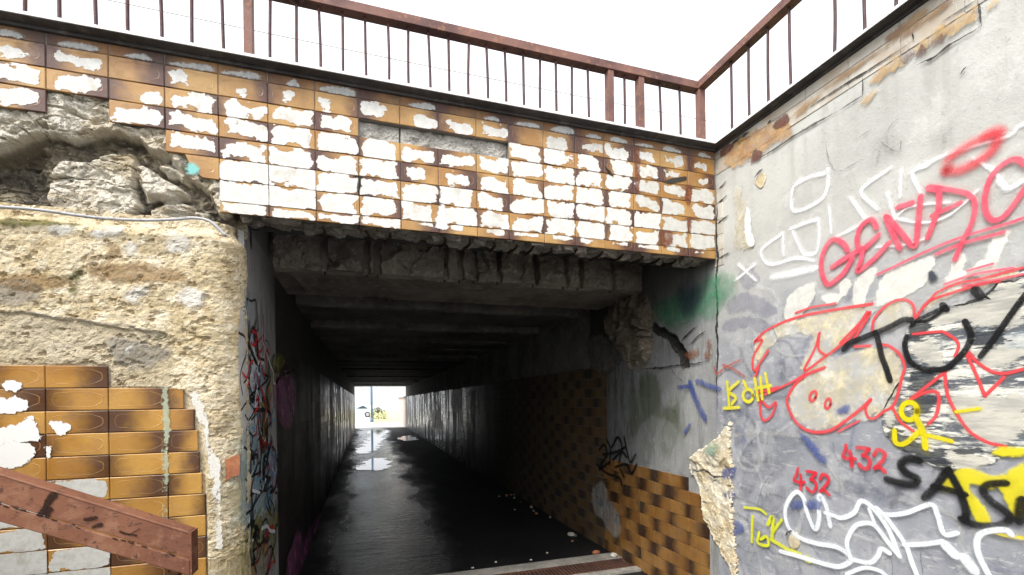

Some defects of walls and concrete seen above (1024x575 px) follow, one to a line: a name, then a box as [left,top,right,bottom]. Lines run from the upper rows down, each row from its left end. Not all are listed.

peeling [857,0,998,108]
spalling [0,44,715,269]
peeling [125,285,148,302]
peeling [175,287,205,308]
crack [645,181,730,406]
peeling [0,380,71,469]
peeling [0,478,108,521]
spalling [689,421,739,575]
peeling [0,522,110,575]